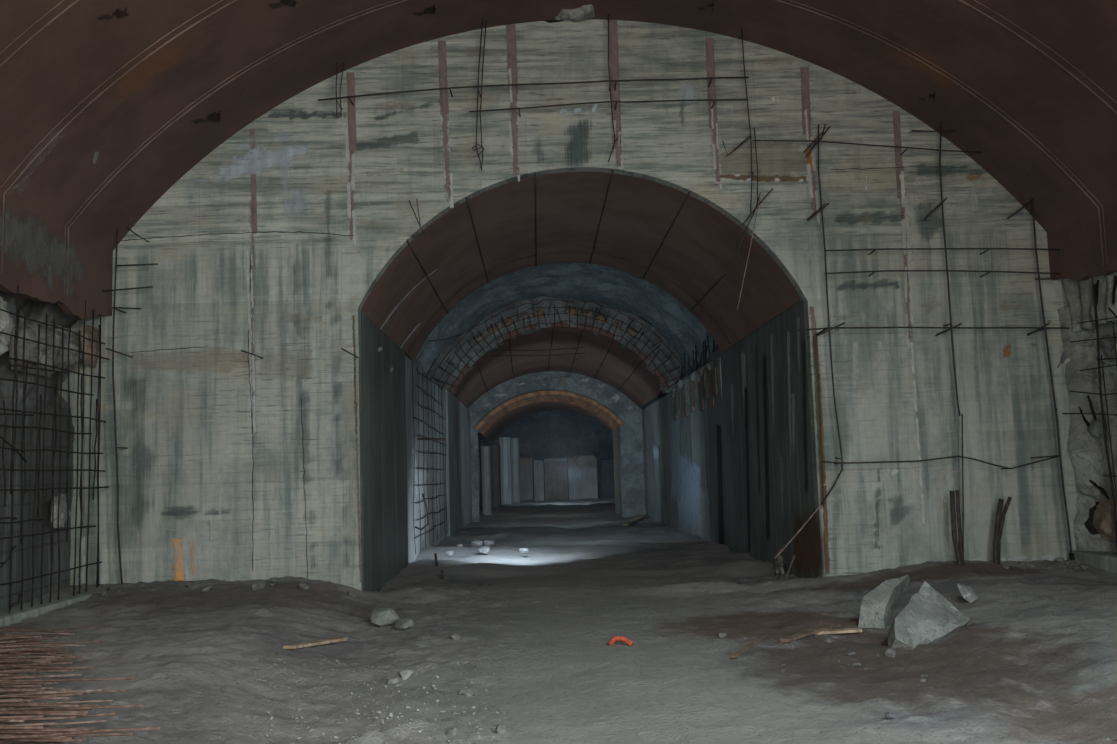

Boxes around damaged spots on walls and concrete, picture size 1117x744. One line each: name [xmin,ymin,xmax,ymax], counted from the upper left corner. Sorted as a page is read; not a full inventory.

spalling [0,296,99,377]
spalling [412,299,722,554]
spalling [51,494,71,528]